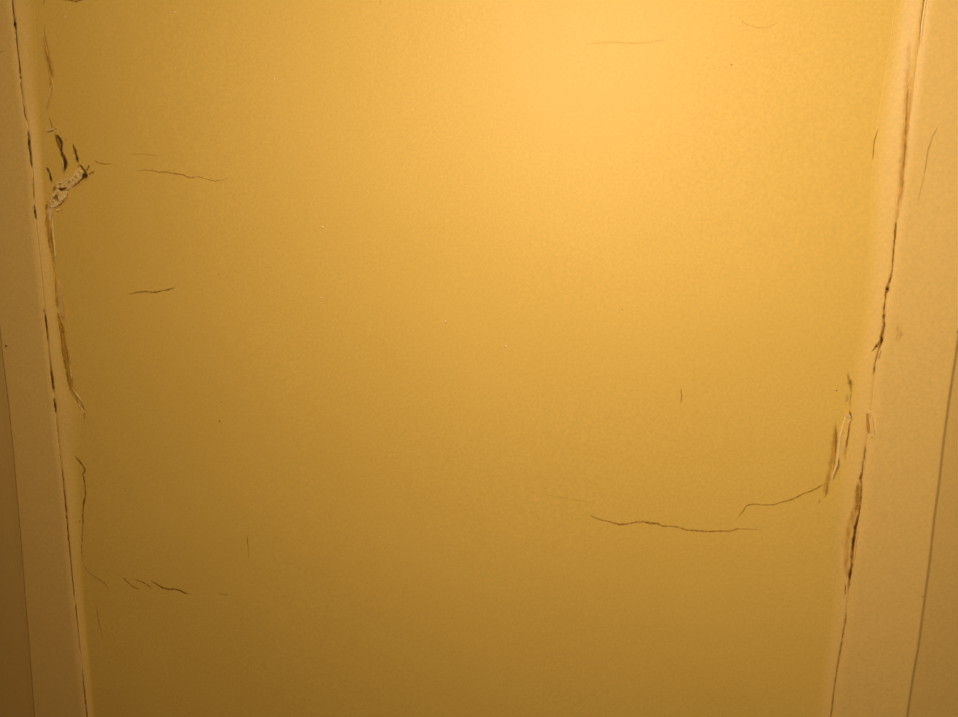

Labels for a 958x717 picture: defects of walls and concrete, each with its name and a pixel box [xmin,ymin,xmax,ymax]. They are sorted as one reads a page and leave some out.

spalling [45,166,94,220]
crack [873,223,896,370]
peeling [831,412,854,483]